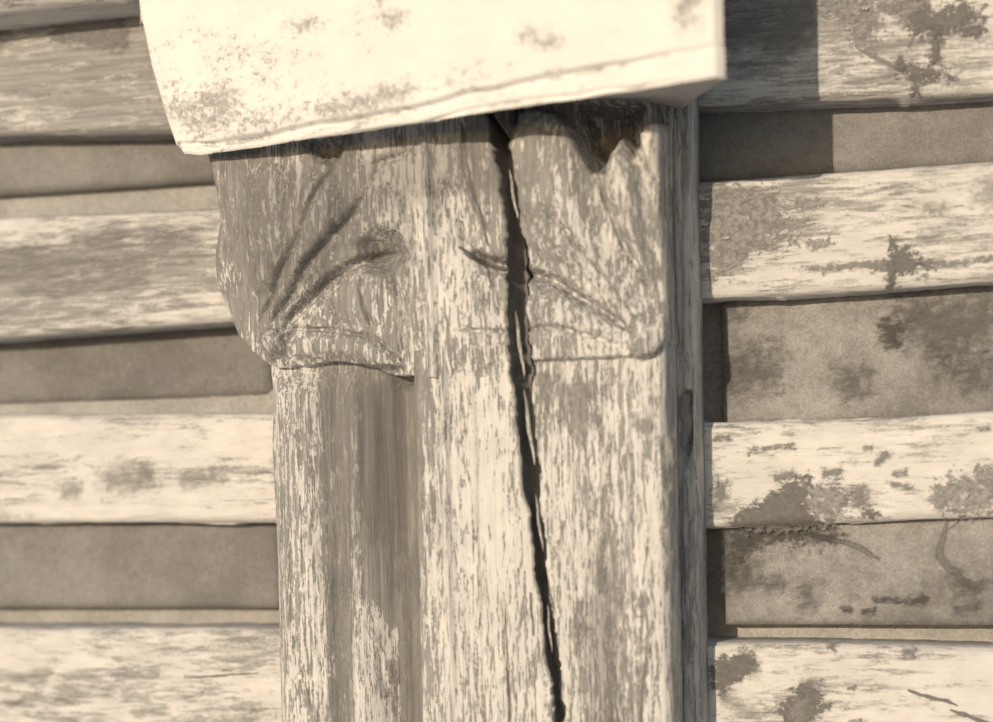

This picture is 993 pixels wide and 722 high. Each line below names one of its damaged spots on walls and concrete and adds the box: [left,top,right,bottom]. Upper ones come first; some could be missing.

water stain [855,0,993,106]
crack [458,111,566,722]
peeling [534,368,603,452]
peeling [631,414,673,497]
water stain [747,442,795,456]
water stain [863,446,891,466]
water stain [890,469,913,490]
water stain [720,525,845,587]
peeling [375,655,403,702]
peeling [572,598,592,694]
peeling [628,586,651,708]
water stain [707,647,760,700]